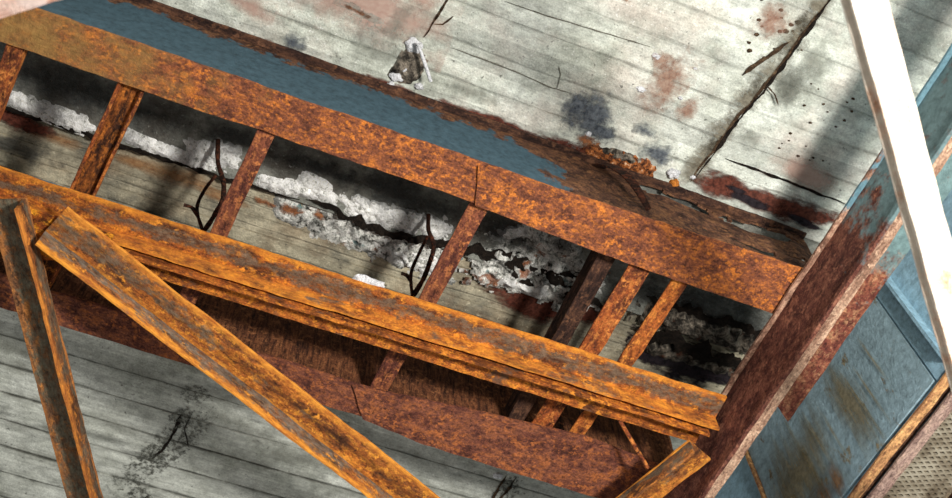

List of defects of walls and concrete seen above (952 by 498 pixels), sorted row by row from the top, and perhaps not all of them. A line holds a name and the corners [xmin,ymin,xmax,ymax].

spalling [387,37,429,90]
corrosion [1,110,74,145]
corrosion [440,99,657,177]
damp [561,95,615,140]
damp [634,126,696,187]
crack [685,0,845,204]
corrosion [255,197,325,220]
spalling [271,195,443,282]
spalling [448,225,585,312]
corrosion [693,172,837,225]
corrosion [481,285,557,323]
spalling [644,305,762,377]